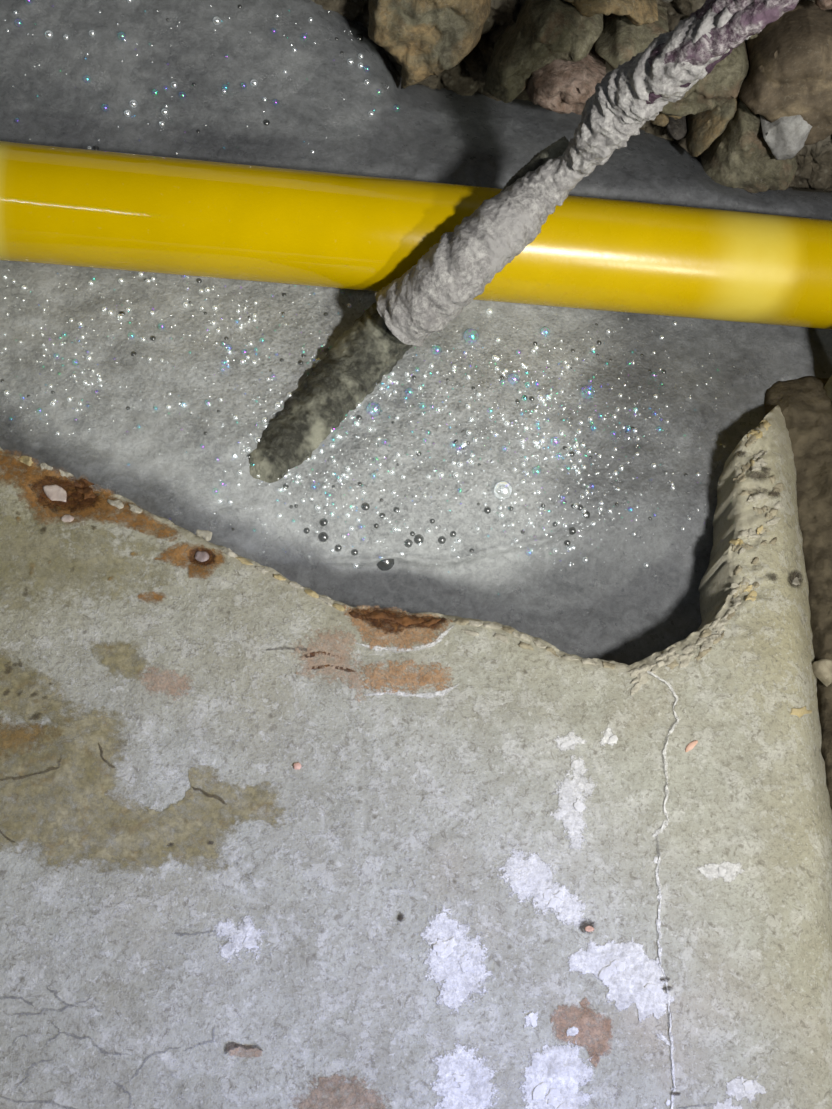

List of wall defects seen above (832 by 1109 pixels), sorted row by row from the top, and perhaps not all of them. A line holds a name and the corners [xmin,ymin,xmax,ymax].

rust [0,451,37,487]
spalling [18,456,143,523]
rust [89,490,224,578]
spalling [628,420,784,695]
peeling [771,571,803,587]
spalling [221,548,616,702]
leakage [497,844,586,929]
crack [638,668,706,1109]
leakage [420,904,492,1014]
leakage [430,1038,499,1109]
leakage [519,1041,593,1109]
rust [551,998,613,1067]